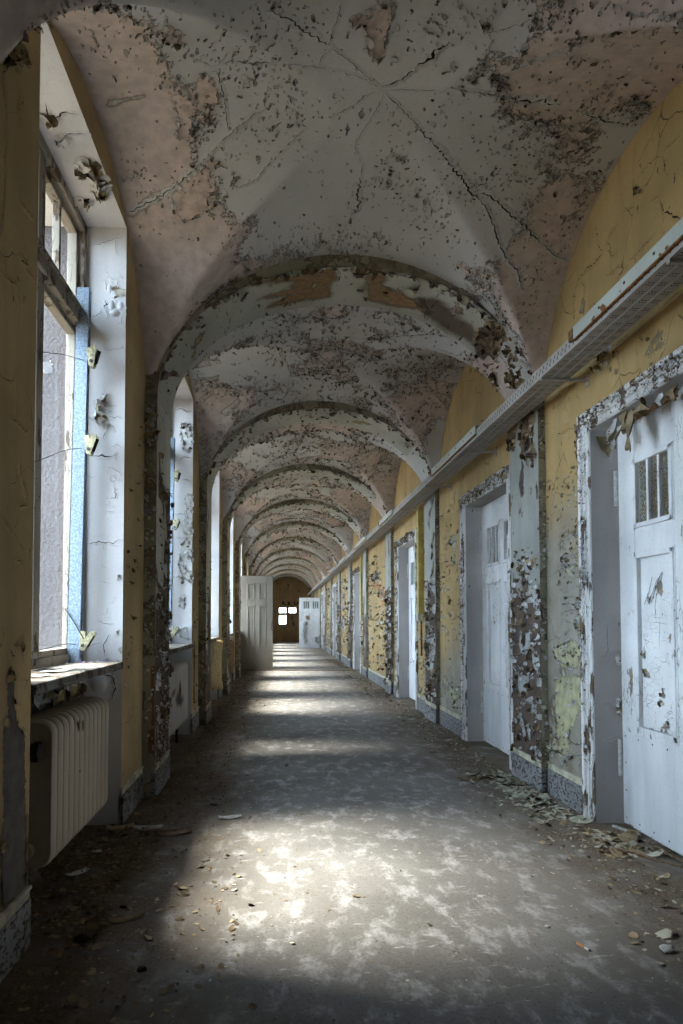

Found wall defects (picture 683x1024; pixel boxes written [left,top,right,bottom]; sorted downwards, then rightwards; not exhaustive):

crack [91,68,267,353]
crack [235,0,683,291]
peeling [3,0,683,772]
peeling [1,667,28,912]